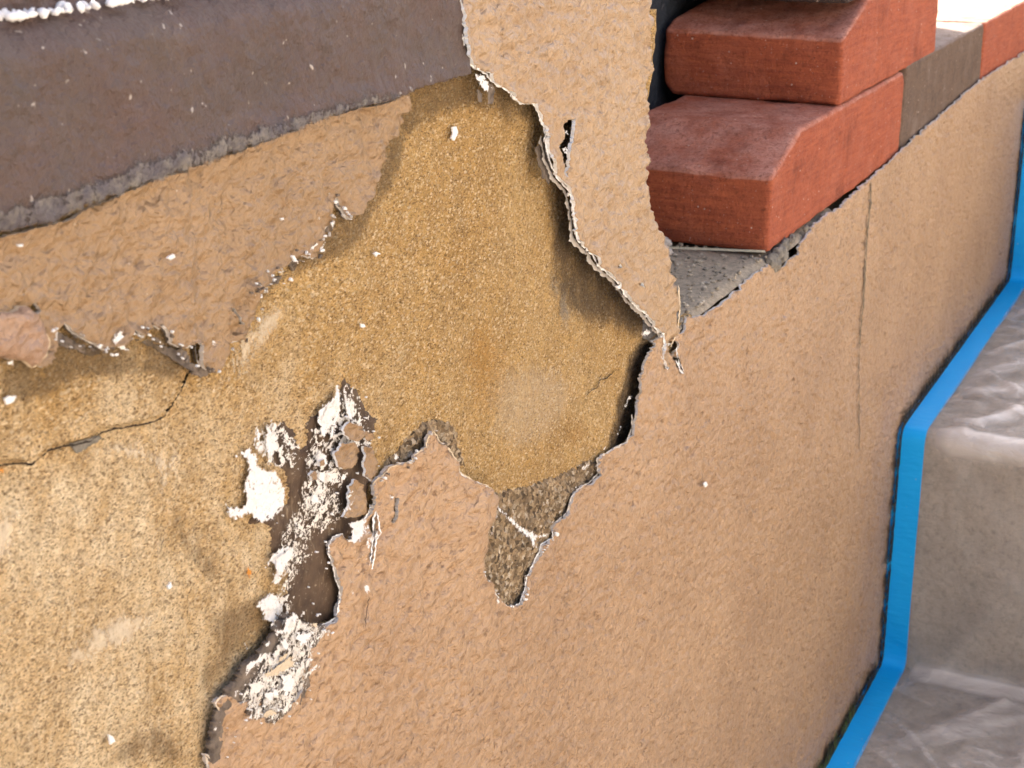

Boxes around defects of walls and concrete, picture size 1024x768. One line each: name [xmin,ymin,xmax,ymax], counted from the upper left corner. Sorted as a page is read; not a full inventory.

crack [0,370,190,466]
peeling [49,322,221,378]
peeling [204,0,681,768]
crack [858,187,872,452]